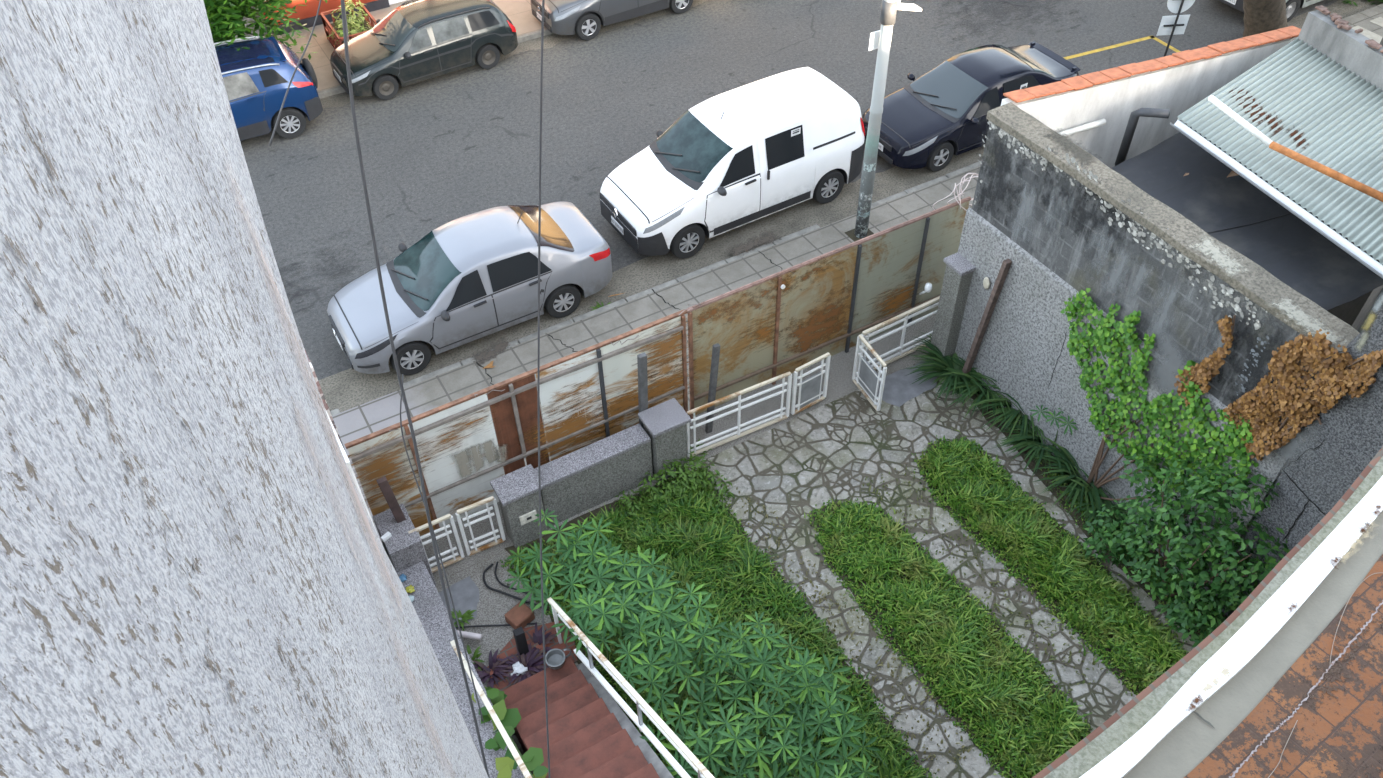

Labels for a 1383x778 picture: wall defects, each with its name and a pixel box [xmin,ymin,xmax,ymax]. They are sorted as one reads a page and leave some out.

rust [1229,88,1309,148]
water stain [978,118,1153,296]
water stain [1144,286,1294,404]
rust [347,410,488,508]